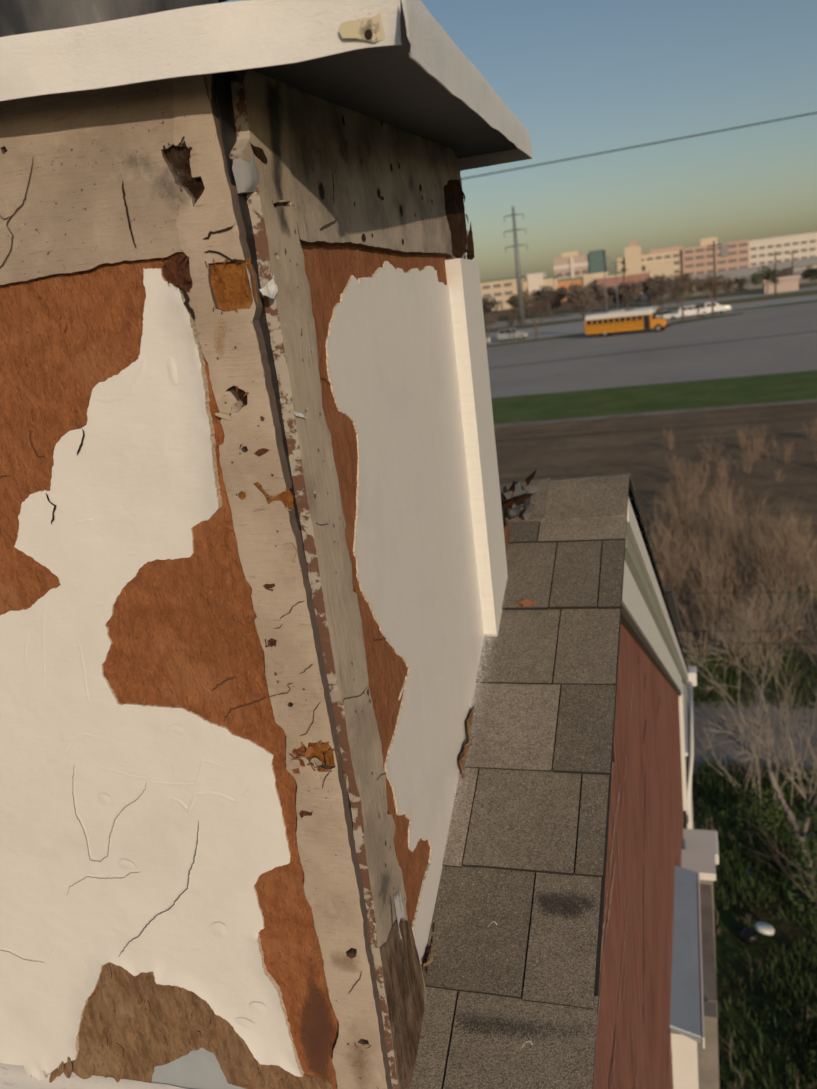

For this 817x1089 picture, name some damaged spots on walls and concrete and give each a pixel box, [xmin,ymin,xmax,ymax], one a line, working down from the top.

crack [0,159,33,268]
crack [122,181,136,248]
damp [268,85,289,230]
spalling [205,258,258,314]
peeling [0,252,192,615]
peeling [285,230,447,926]
peeling [103,355,351,1089]
crack [0,943,58,967]
crack [67,759,227,894]
crack [118,818,200,957]